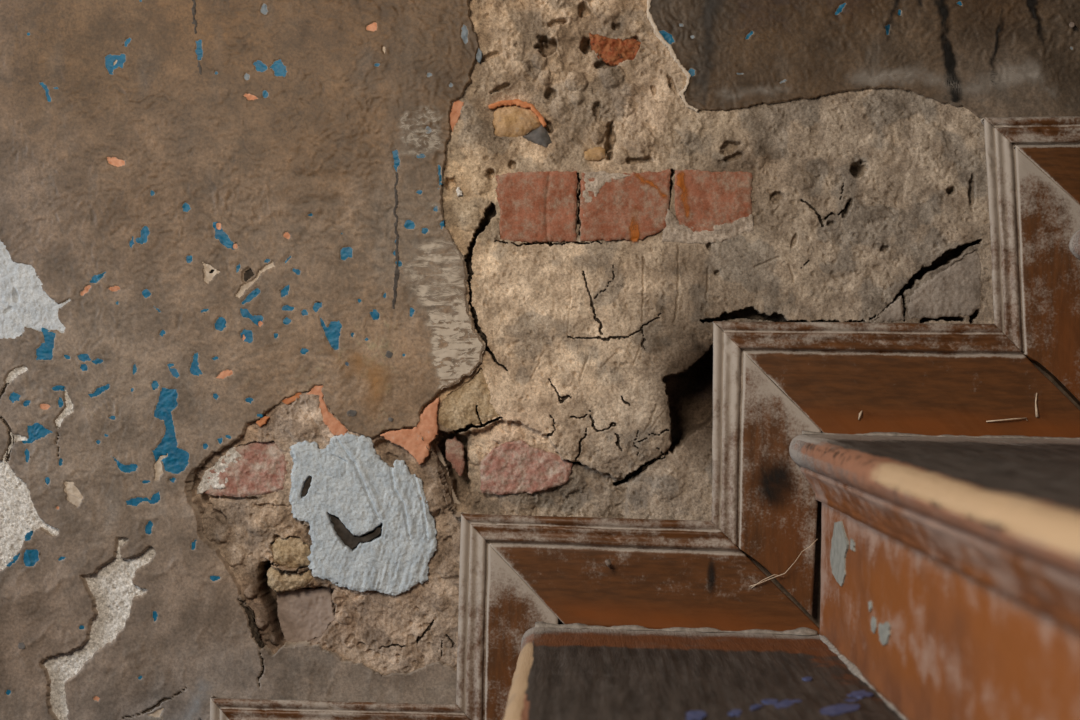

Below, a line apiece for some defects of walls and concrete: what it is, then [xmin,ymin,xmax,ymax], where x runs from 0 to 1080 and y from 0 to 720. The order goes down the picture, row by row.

peeling [105,38,131,75]
water stain [932,0,960,103]
water stain [1027,0,1044,41]
peeling [107,157,125,167]
crack [668,169,676,198]
crack [801,183,849,227]
crack [464,173,661,371]
crack [700,240,980,323]
flaking render [113,0,995,675]
peeling [0,241,120,571]
flaking render [43,521,156,720]